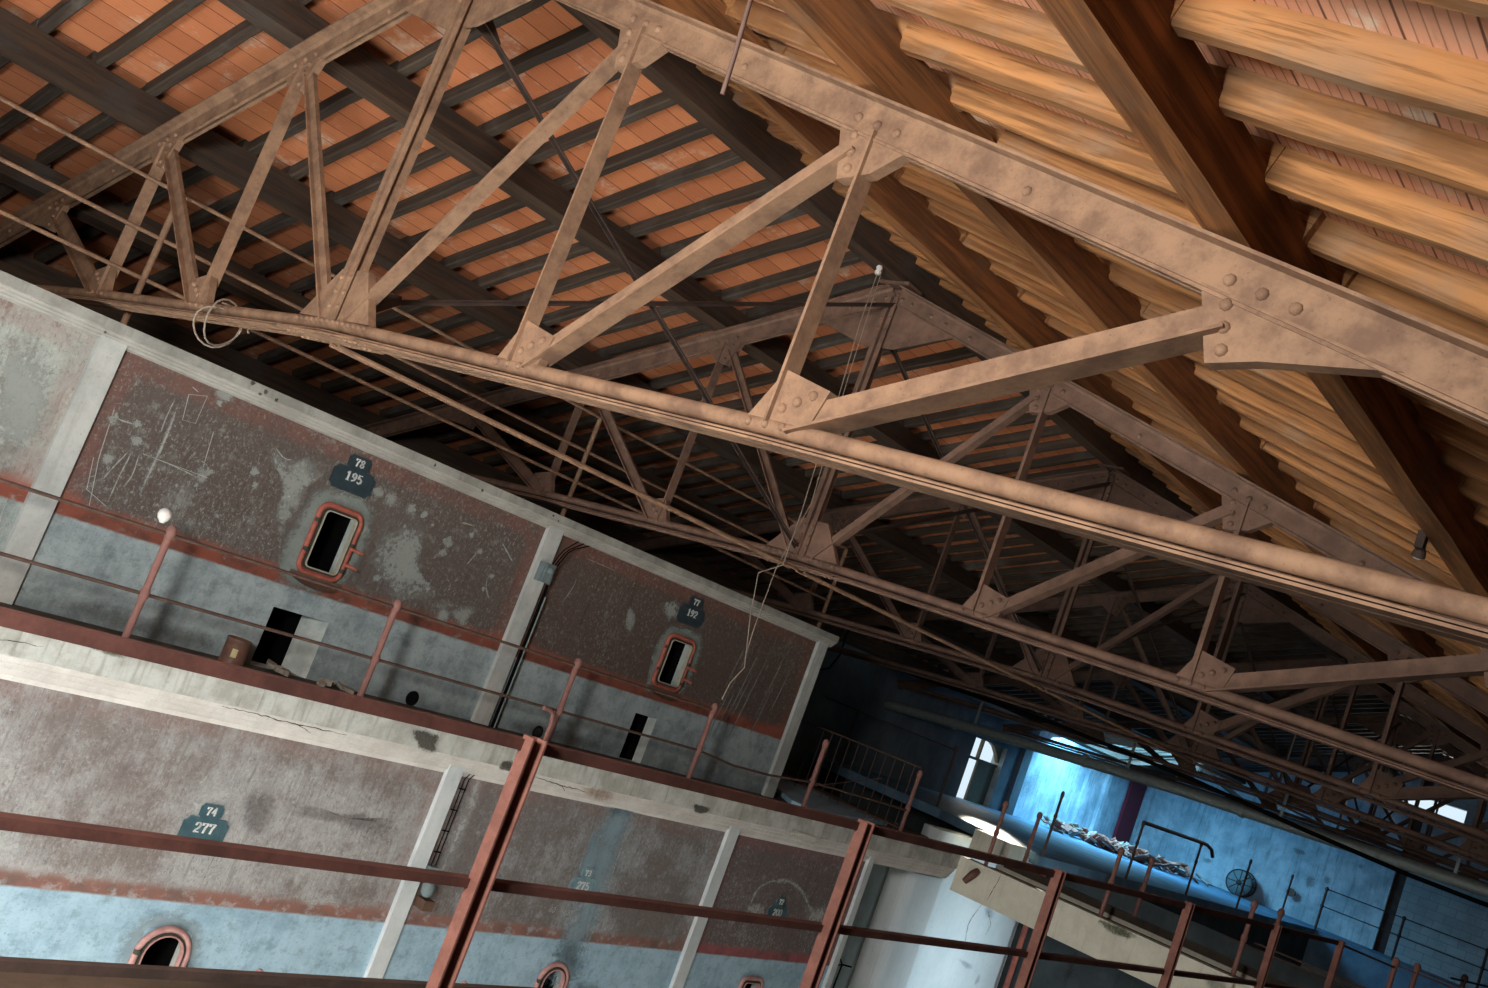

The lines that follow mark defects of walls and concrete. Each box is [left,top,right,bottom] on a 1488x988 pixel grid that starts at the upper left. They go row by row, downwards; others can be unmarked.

peeling [373,487,473,626]
damp [553,809,632,984]